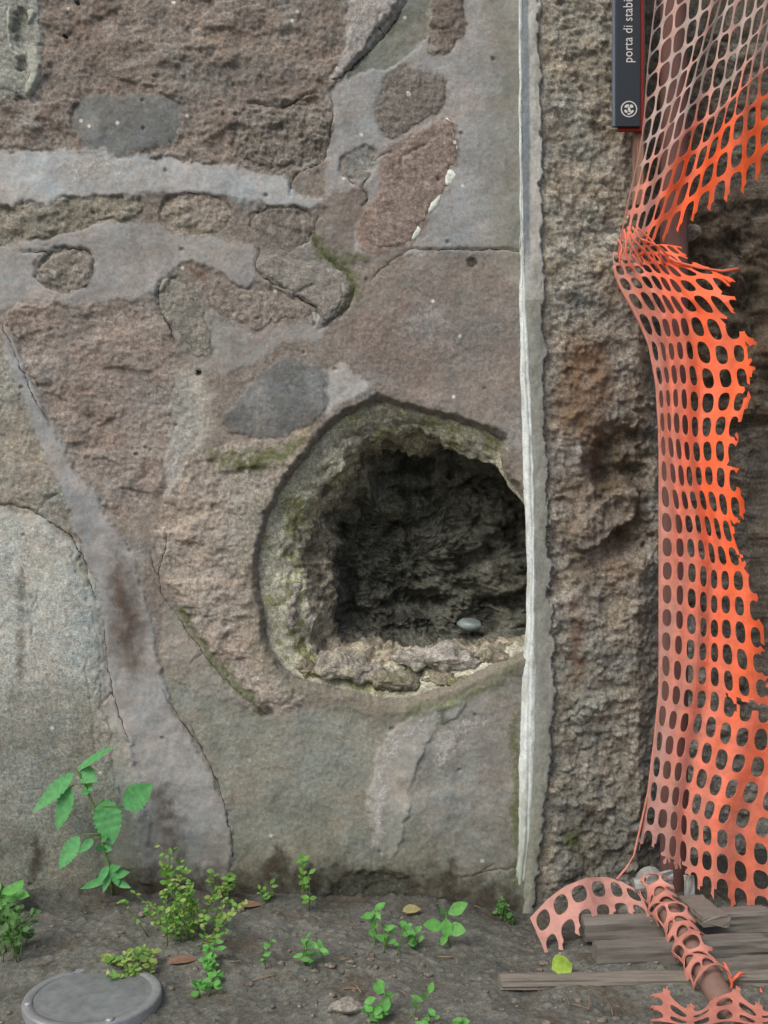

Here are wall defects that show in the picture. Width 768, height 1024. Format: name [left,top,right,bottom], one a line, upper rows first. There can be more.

crack [164,692,233,873]